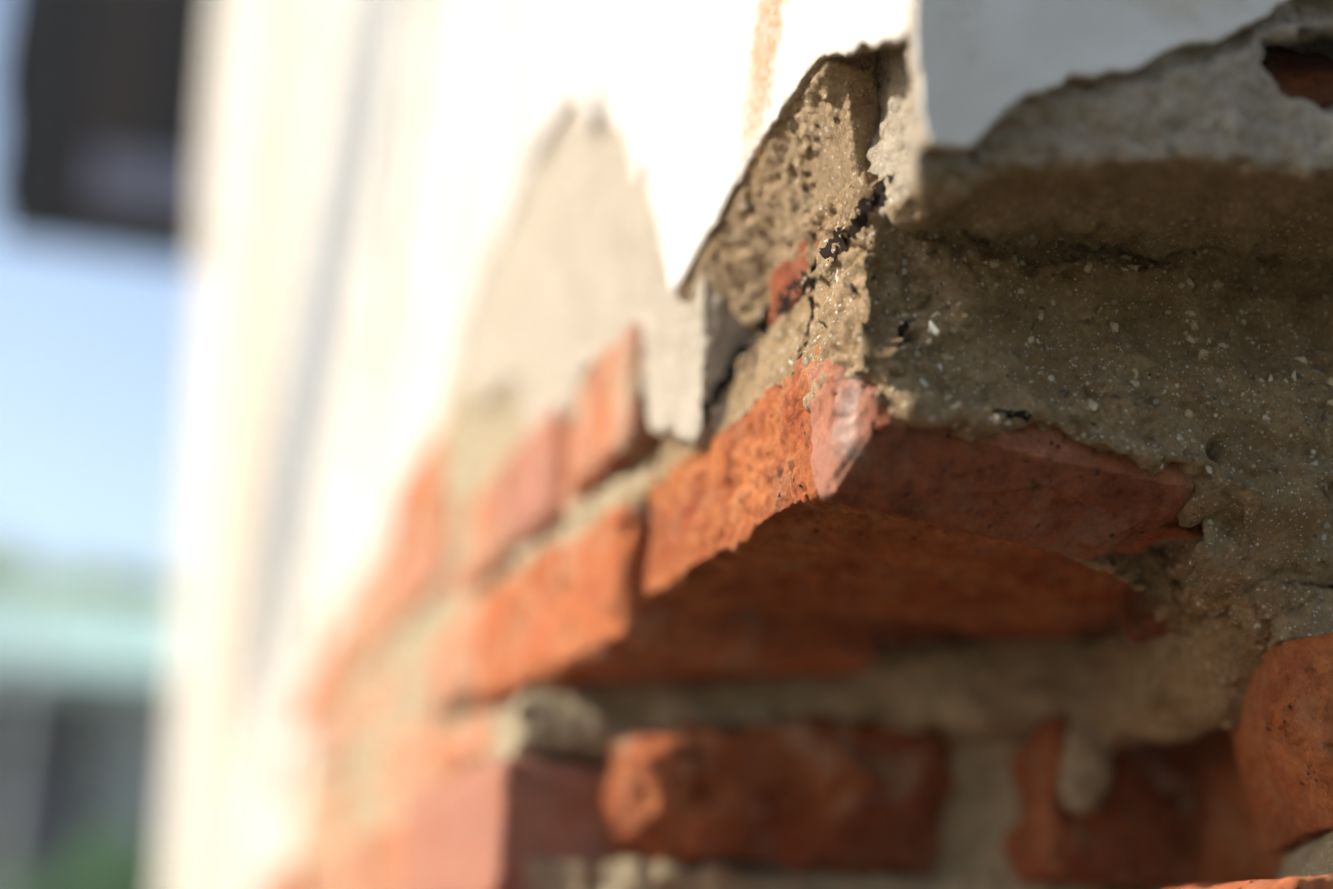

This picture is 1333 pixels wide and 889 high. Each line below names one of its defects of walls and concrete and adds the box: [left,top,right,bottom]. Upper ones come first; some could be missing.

crack [702,172,898,427]
spalling [447,0,1333,448]
spalling [806,360,1195,560]